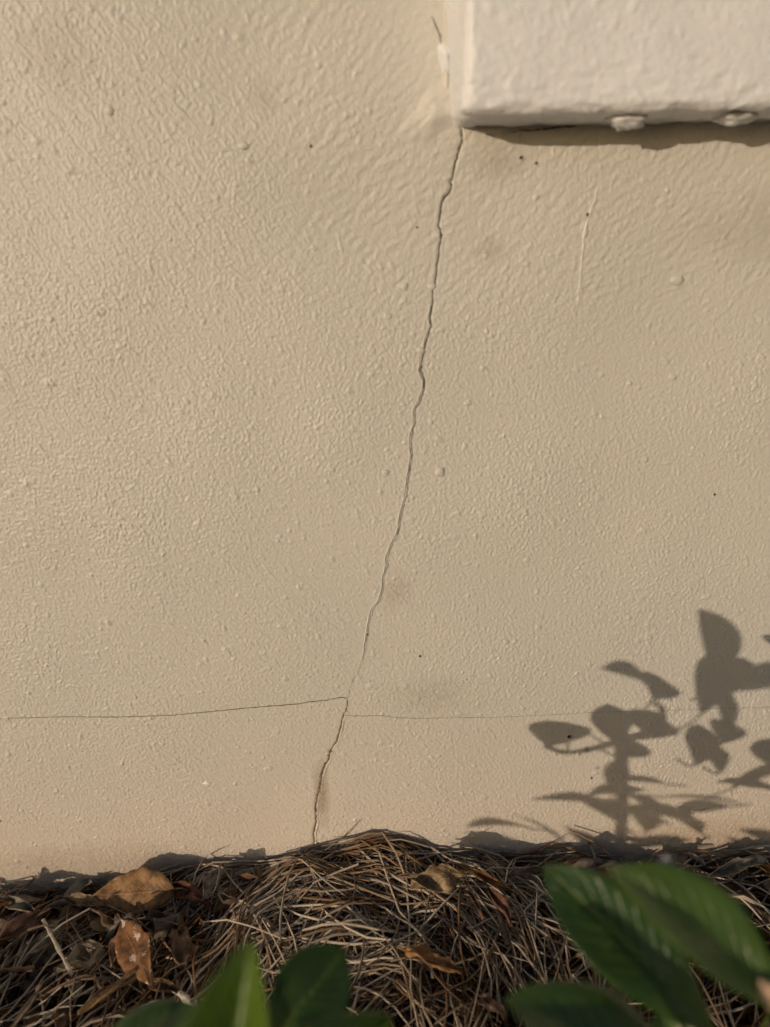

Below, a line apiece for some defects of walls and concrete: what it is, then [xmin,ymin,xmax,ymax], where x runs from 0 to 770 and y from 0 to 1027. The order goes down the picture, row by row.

crack [131,127,463,849]